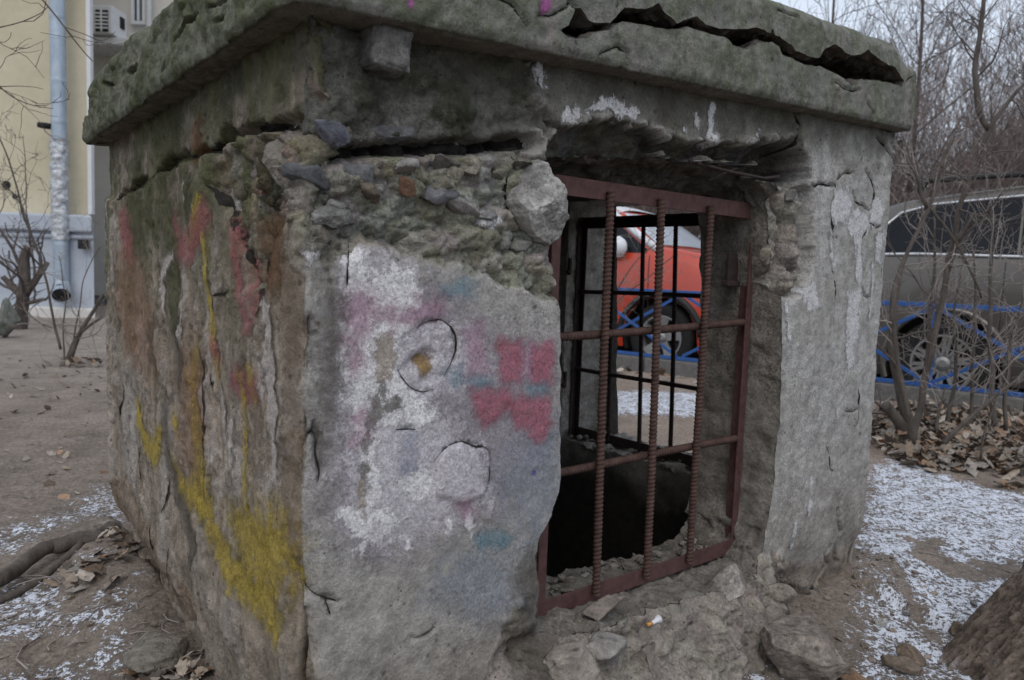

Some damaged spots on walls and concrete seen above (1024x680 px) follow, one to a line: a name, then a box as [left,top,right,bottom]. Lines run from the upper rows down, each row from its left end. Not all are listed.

crack [501,0,911,115]
crack [328,138,524,210]
crack [813,172,879,238]
spalling [211,15,811,555]
crack [398,319,457,392]
crack [305,425,320,481]
crack [437,441,490,483]